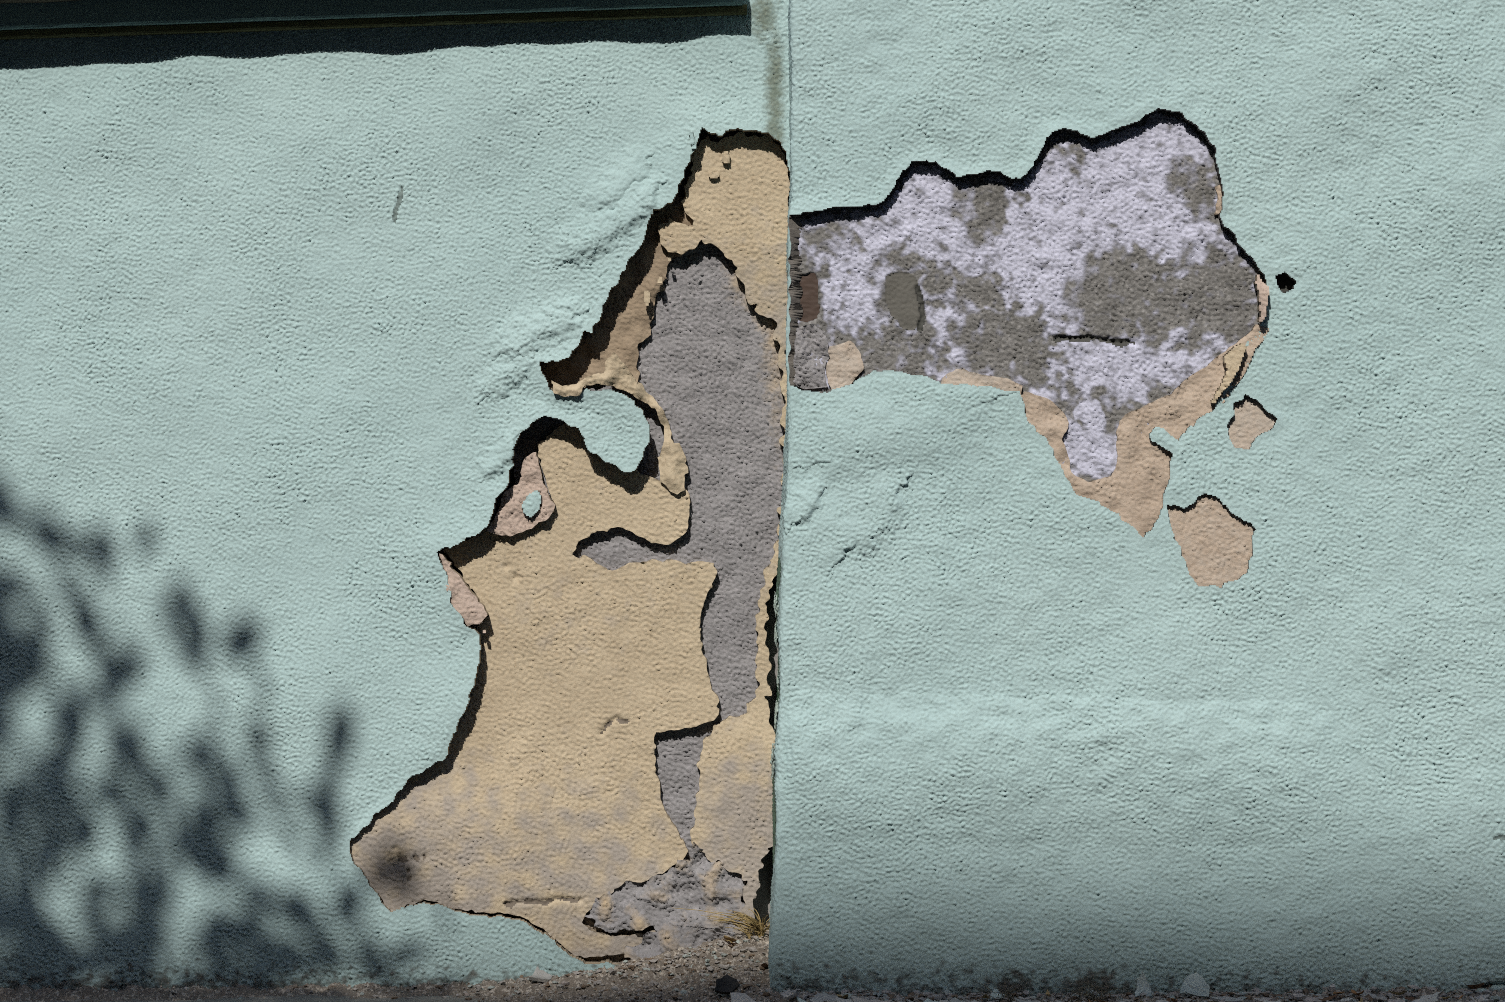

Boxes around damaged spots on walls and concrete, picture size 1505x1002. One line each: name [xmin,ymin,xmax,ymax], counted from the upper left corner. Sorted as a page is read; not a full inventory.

flaking render [350,109,1294,969]